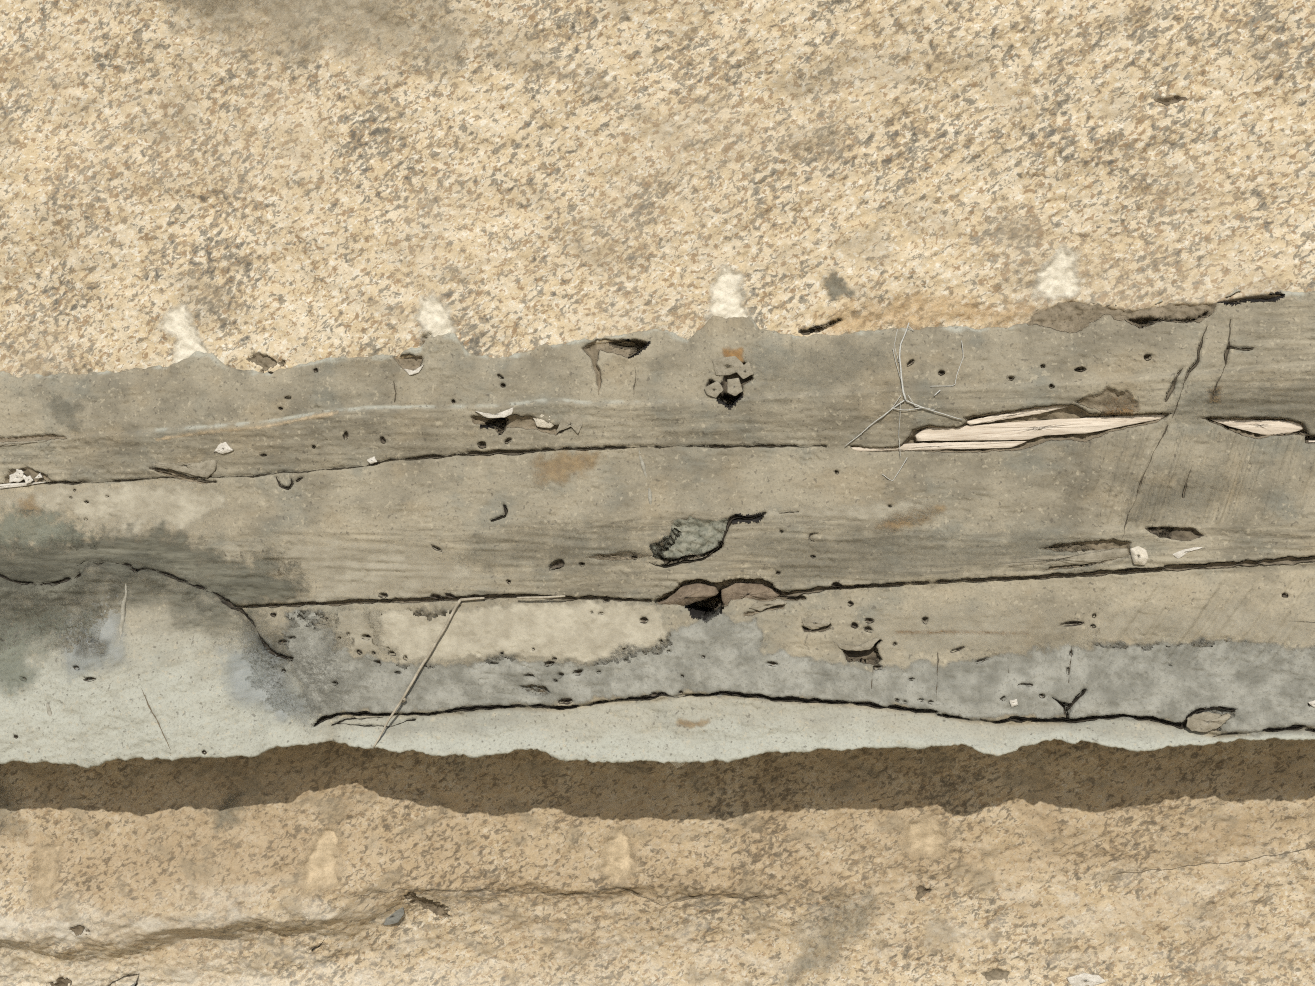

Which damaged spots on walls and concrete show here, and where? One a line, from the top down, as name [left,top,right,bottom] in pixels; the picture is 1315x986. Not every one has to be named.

spalling [704,356,754,409]
spalling [851,387,1172,453]
crack [1122,319,1254,538]
spalling [580,512,764,567]
crack [649,511,816,567]
crack [0,561,650,659]
spalling [656,572,805,623]
spalling [802,617,831,632]
spalling [837,618,897,670]
crack [780,556,1315,596]
crack [313,647,1315,737]
crack [1112,844,1315,875]